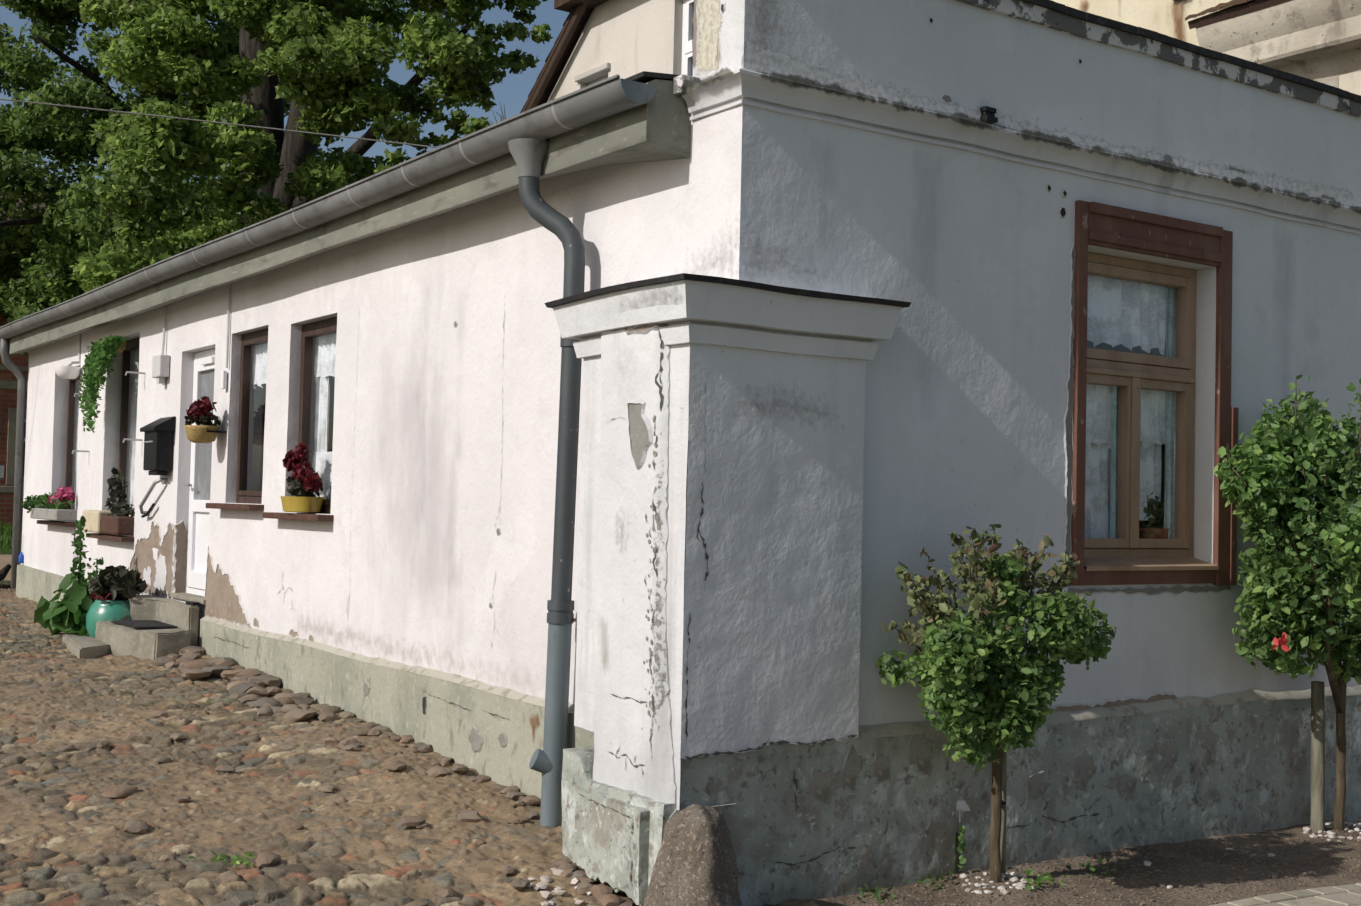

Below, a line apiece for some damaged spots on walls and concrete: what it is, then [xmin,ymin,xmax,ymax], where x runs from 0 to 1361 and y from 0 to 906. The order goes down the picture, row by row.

flaking render [1046,184,1067,219]
flaking render [130,519,188,598]
flaking render [205,546,259,628]
flaking render [627,399,667,734]
crack [607,330,857,810]